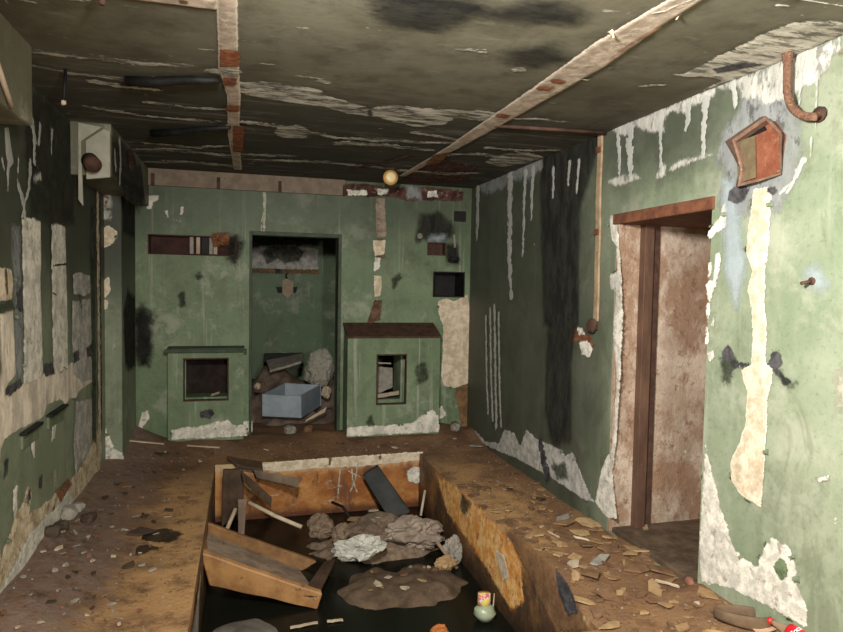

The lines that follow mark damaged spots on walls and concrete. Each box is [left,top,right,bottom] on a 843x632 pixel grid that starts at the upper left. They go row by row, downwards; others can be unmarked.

damp [608,21,843,303]
flaking render [0,217,124,593]
peeling [138,410,149,428]
peeling [170,409,253,440]
peeling [347,406,447,452]
peeling [437,295,469,389]
peeling [475,214,623,519]
peeling [705,185,793,507]
peeling [61,524,136,575]
spalling [188,454,599,632]
peeling [699,445,808,627]